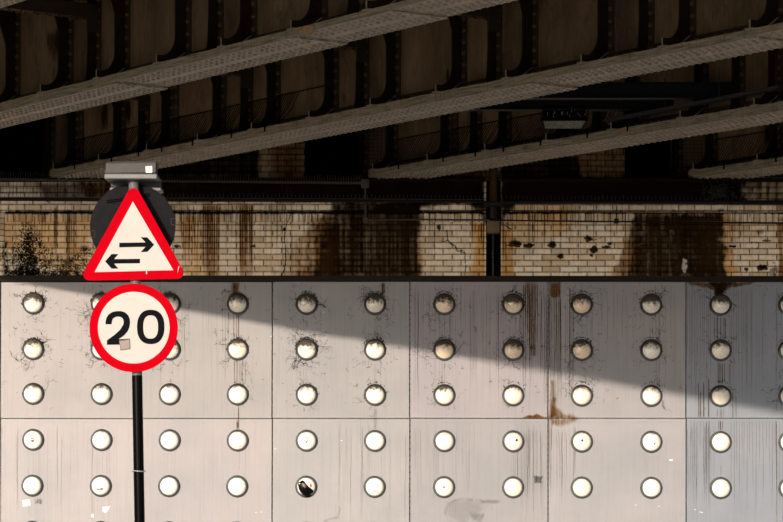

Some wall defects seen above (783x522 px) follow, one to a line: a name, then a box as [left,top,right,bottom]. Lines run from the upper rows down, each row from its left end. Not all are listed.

leakage [158,150,783,276]
leakage [0,222,92,275]
crack [442,229,466,272]